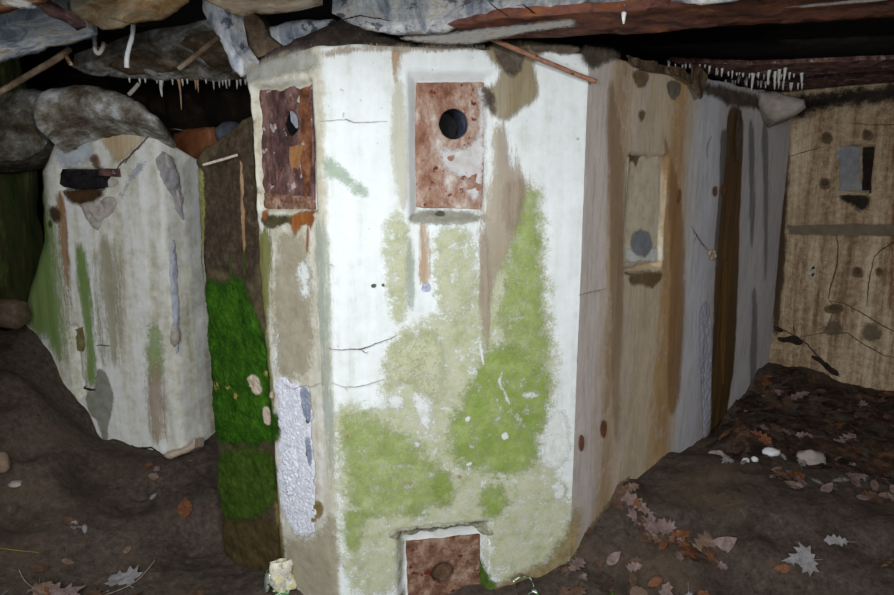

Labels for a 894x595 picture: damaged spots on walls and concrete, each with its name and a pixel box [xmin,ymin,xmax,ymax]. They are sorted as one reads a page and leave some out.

rust [262,86,315,251]
crack [332,336,395,353]
leakage [667,81,894,438]
crack [774,236,894,377]
peeling [247,375,316,537]